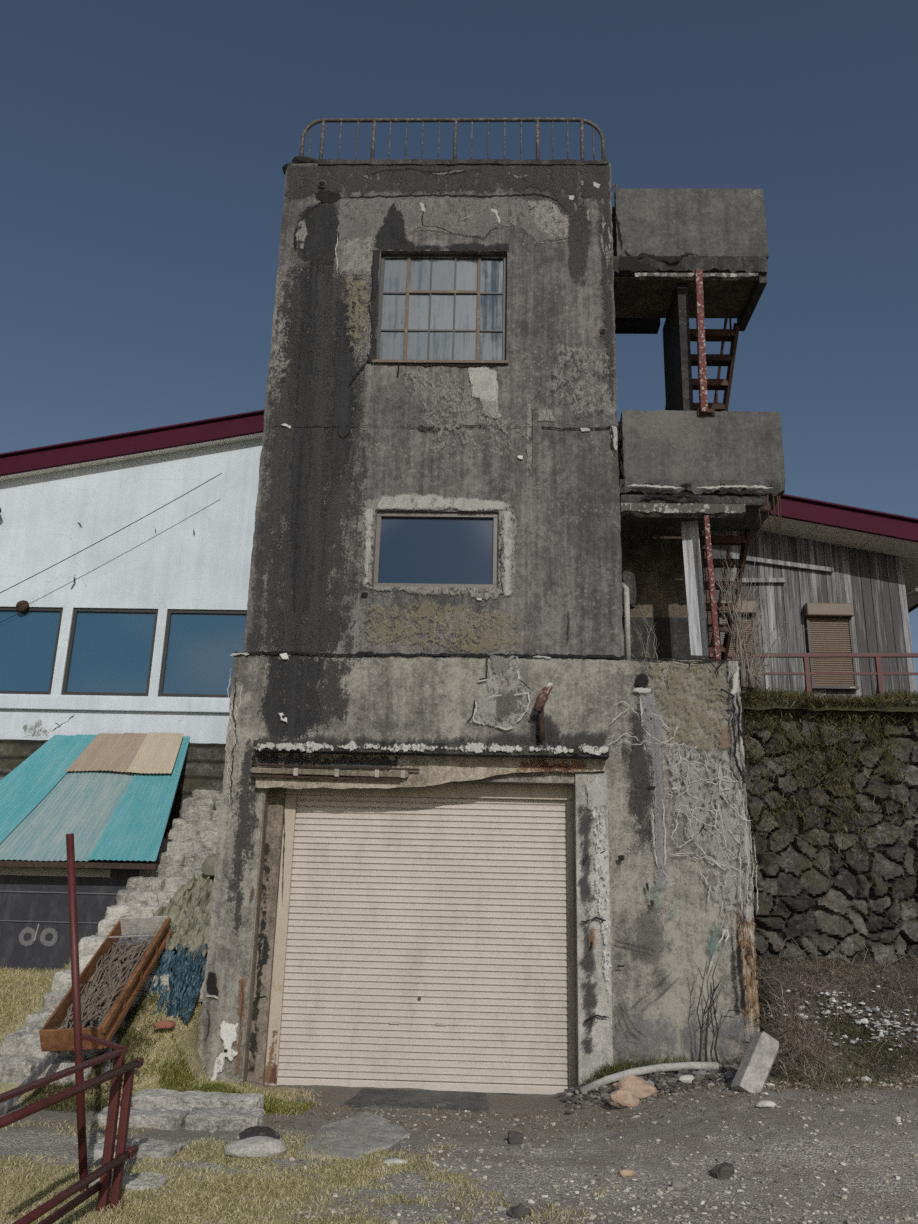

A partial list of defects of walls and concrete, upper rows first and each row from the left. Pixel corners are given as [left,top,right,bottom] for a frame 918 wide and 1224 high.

water stain [285,164,615,401]
peeling [225,668,243,807]
water stain [227,249,608,1072]
peeling [256,740,608,755]
spalling [467,656,532,730]
corrosion [529,713,560,738]
water stain [622,694,677,918]